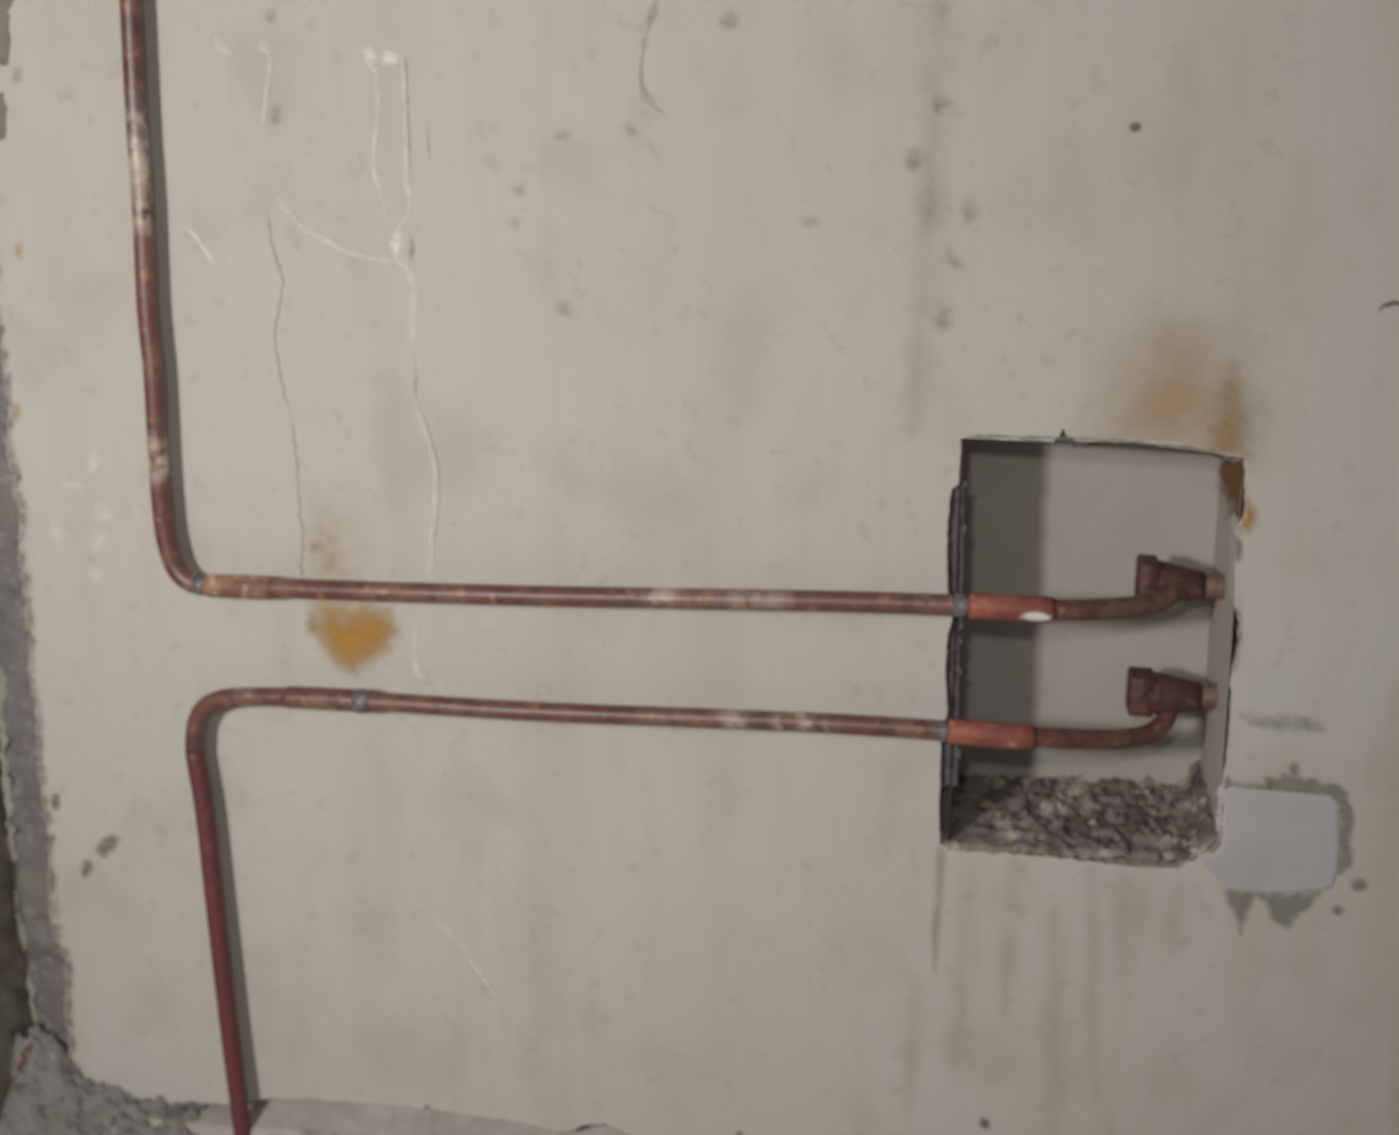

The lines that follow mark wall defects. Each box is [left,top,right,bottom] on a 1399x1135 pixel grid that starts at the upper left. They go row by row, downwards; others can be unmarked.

peeling [0,0,14,66]
peeling [0,93,8,140]
rust [1211,414,1253,527]
spalling [947,480,967,594]
rust [311,615,387,663]
spalling [946,616,962,720]
spalling [1232,611,1240,665]
spalling [0,326,73,1117]
spalling [940,742,1224,862]